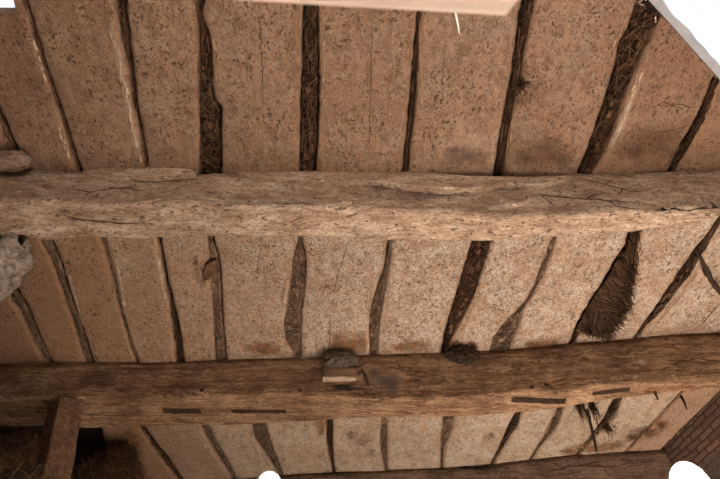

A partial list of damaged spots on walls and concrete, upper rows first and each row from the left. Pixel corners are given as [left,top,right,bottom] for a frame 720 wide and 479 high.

crack [64,185,141,196]
crack [520,179,639,209]
crack [657,202,719,215]